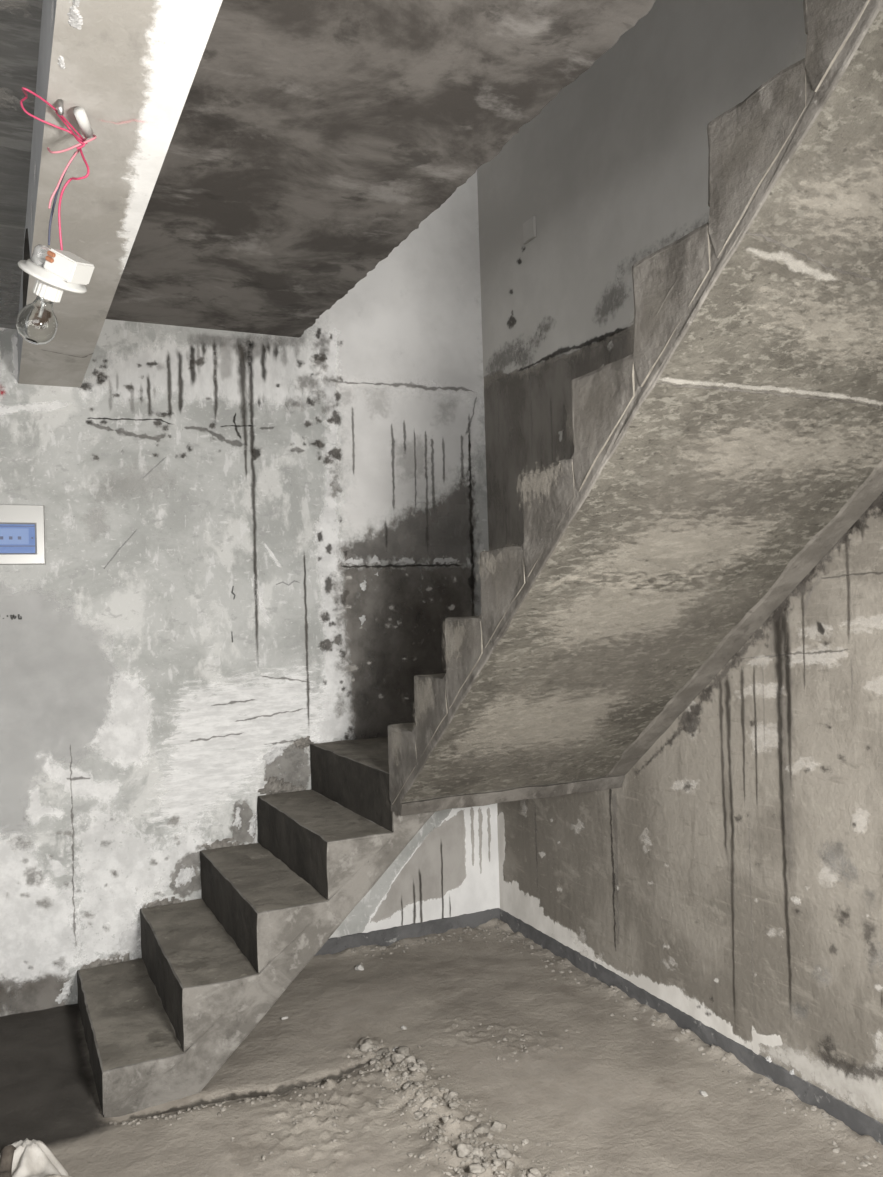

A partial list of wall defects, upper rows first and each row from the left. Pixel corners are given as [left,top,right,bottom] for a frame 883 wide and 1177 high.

peeling [67,0,83,30]
flaking render [0,332,354,1004]
damp [80,328,355,638]
damp [304,423,475,740]
damp [401,873,422,924]
peeling [371,808,883,1118]
damp [635,492,883,1016]
damp [819,1036,883,1079]